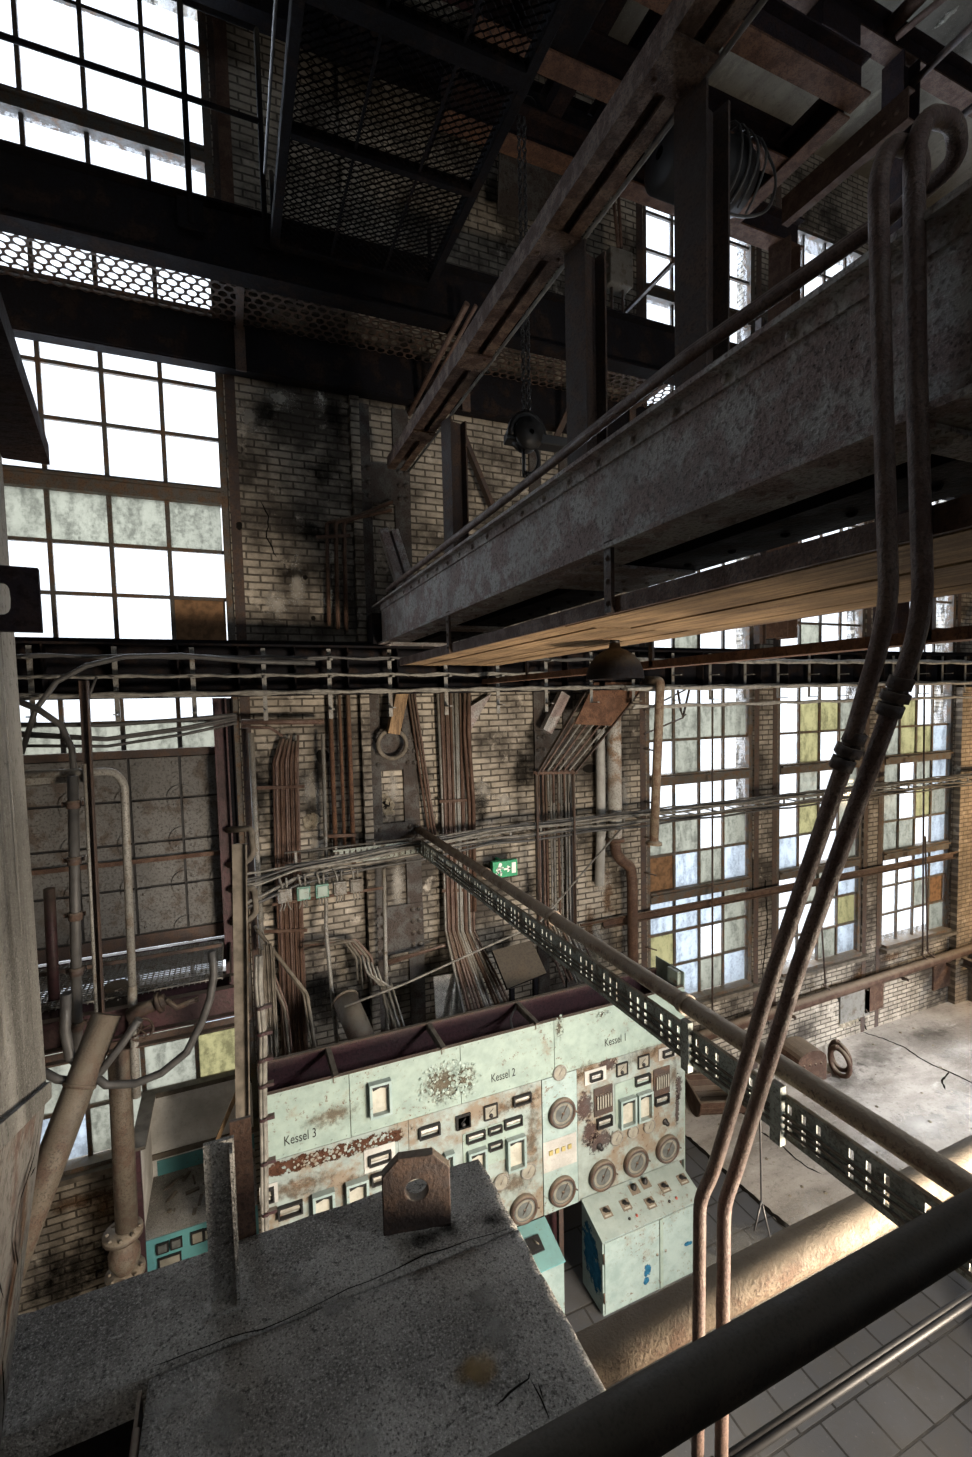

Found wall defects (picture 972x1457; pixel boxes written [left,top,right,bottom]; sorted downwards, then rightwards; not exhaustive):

crack [495,1372,549,1417]